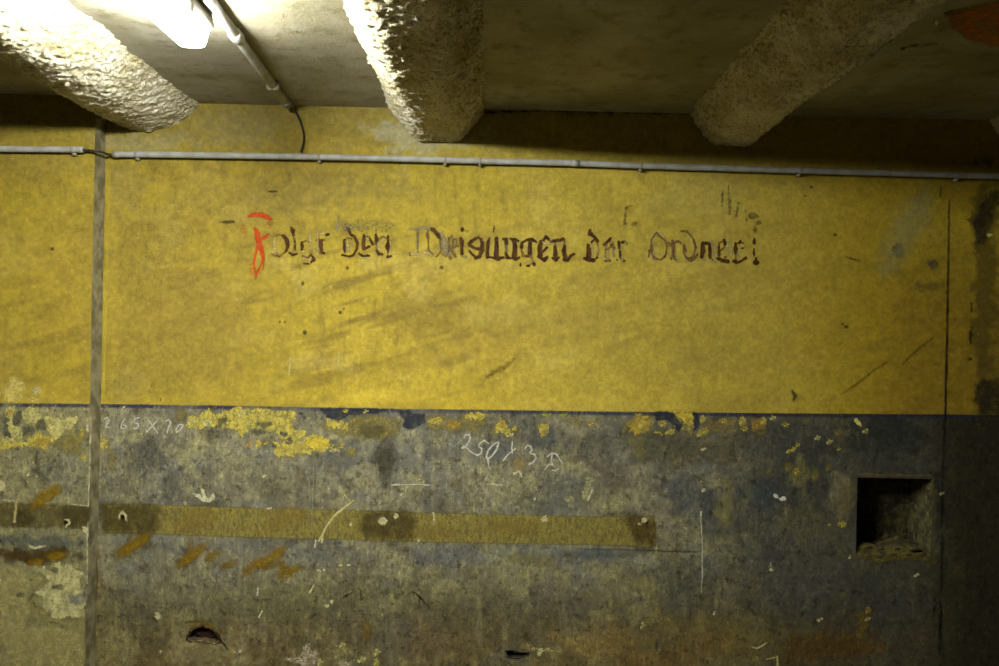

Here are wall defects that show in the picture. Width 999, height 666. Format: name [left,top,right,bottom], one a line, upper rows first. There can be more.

leakage [968,191,999,243]
peeling [0,377,115,507]
peeling [178,405,517,458]
peeling [622,409,790,459]
spalling [184,621,228,666]